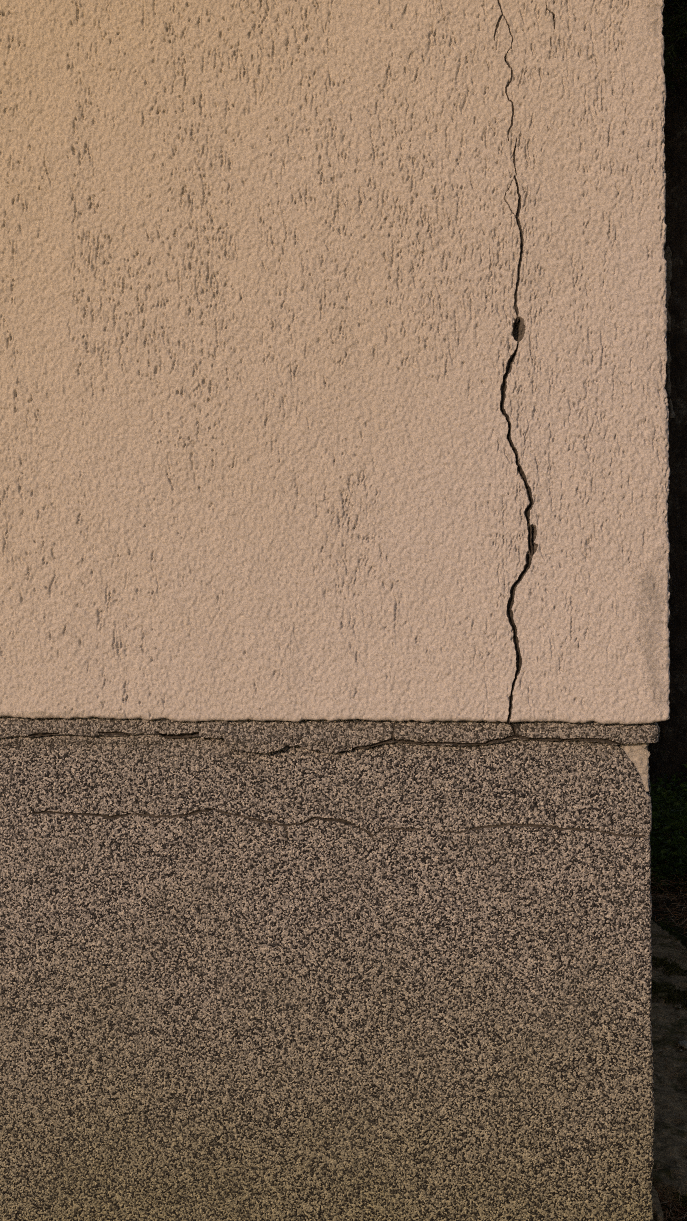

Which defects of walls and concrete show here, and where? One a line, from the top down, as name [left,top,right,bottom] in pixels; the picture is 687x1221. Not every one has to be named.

crack [285,0,620,752]
crack [25,731,59,739]
crack [98,731,199,739]
crack [31,808,646,844]